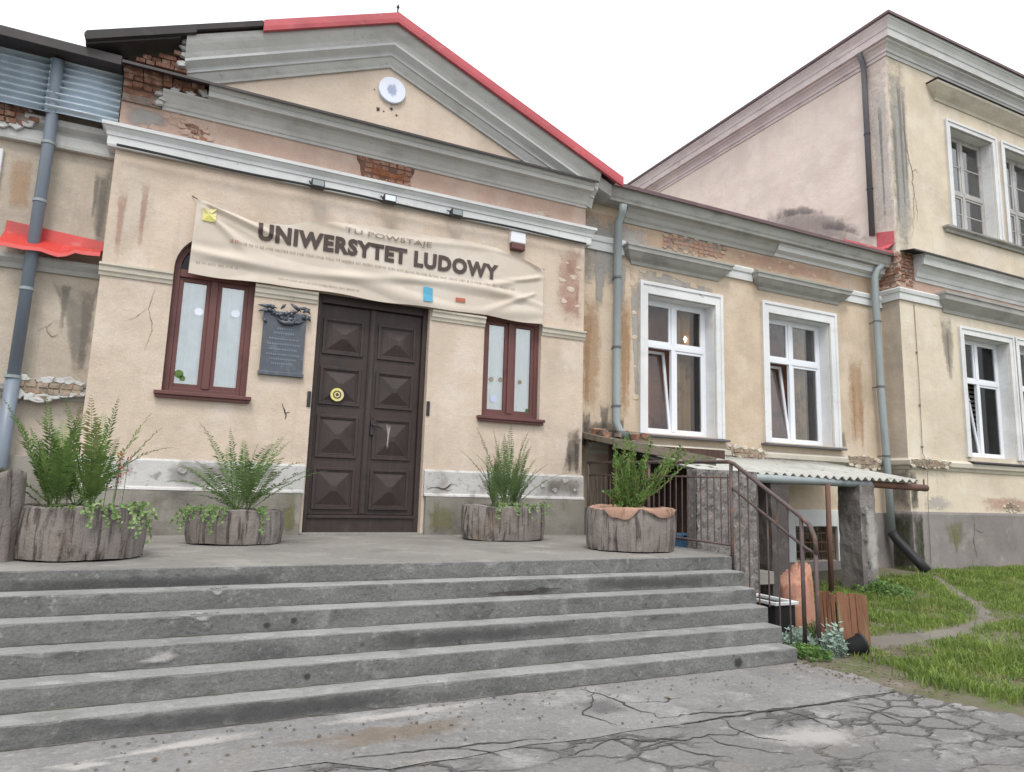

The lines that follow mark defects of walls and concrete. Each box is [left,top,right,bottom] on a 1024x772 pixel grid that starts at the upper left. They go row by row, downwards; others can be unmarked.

flaking render [123,39,214,142]
spalling [357,156,415,187]
damp [880,109,907,203]
crack [893,85,918,235]
damp [93,189,109,233]
spalling [879,251,916,291]
damp [61,291,90,359]
spalling [18,374,86,403]
damp [566,410,623,470]
spalling [848,455,882,471]
spalling [911,456,952,470]
crack [681,690,905,741]